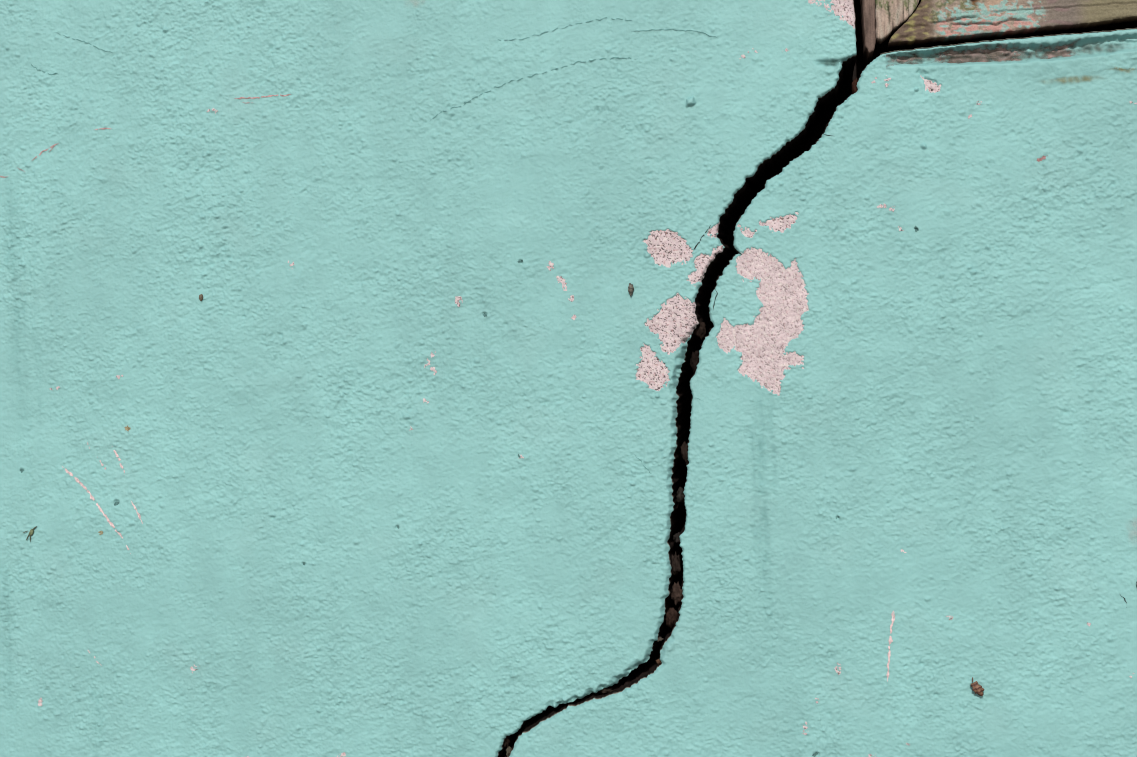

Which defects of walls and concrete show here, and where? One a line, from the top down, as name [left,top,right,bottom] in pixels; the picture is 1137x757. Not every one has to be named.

crack [434,17,716,118]
peeling [808,0,855,29]
peeling [635,222,723,391]
peeling [716,212,809,396]
crack [497,55,879,757]